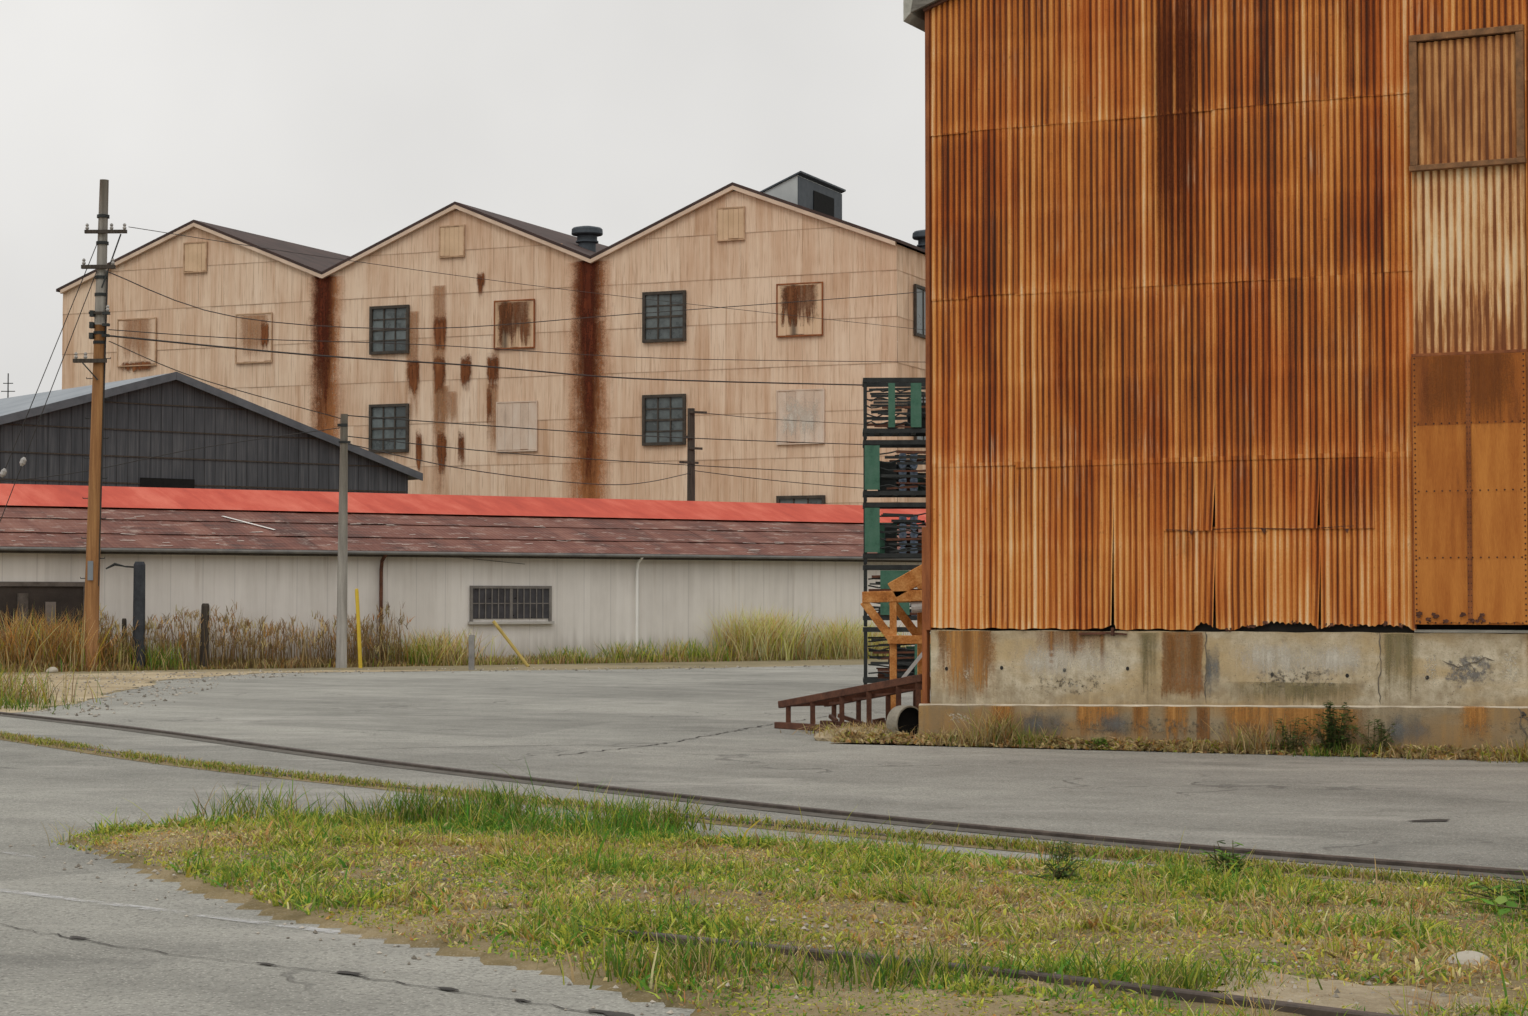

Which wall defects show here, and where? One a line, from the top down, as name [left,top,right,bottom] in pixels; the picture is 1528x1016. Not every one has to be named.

rust [1157,1,1193,213]
rust [313,275,340,438]
rust [406,285,530,488]
rust [477,273,485,294]
rust [573,261,605,499]
rust [782,284,815,325]
rust [1416,611,1486,623]
rust [1077,632,1210,739]
rust [1229,707,1358,741]